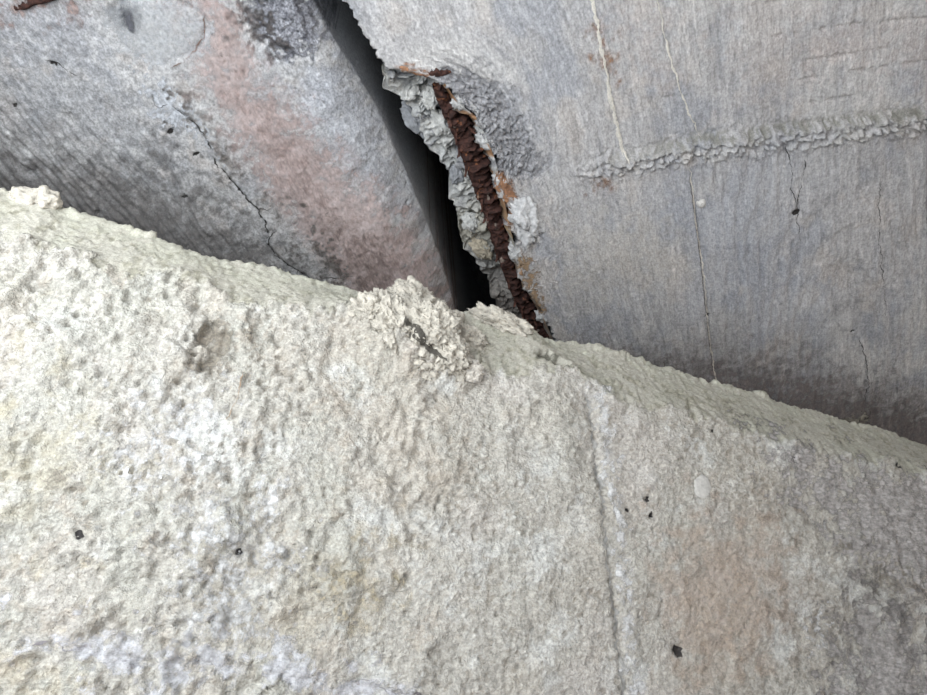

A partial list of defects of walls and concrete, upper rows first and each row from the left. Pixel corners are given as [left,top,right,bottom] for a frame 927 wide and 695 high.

crack [152,96,344,280]
rust [154,0,458,310]
spalling [382,58,553,340]
rust [494,171,517,238]
rust [513,255,547,314]
crack [0,594,10,607]
crack [15,611,421,695]
crack [585,385,645,695]